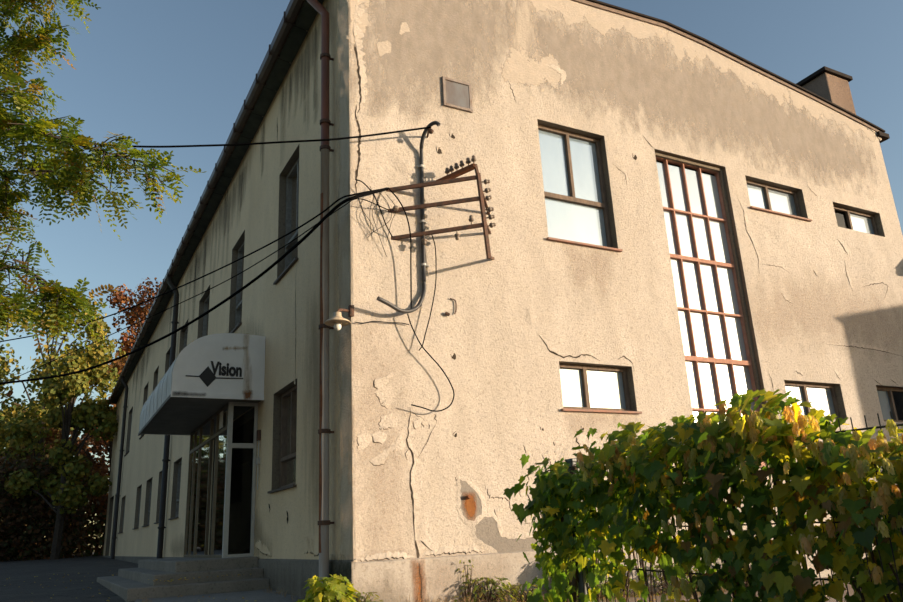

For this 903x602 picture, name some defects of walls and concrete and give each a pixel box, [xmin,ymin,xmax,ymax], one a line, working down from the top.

crack [353,0,375,193]
damp [363,0,872,180]
peeling [528,0,876,142]
peeling [337,0,590,562]
crack [539,334,635,371]
corrosion [413,565,423,602]
crack [405,406,437,602]